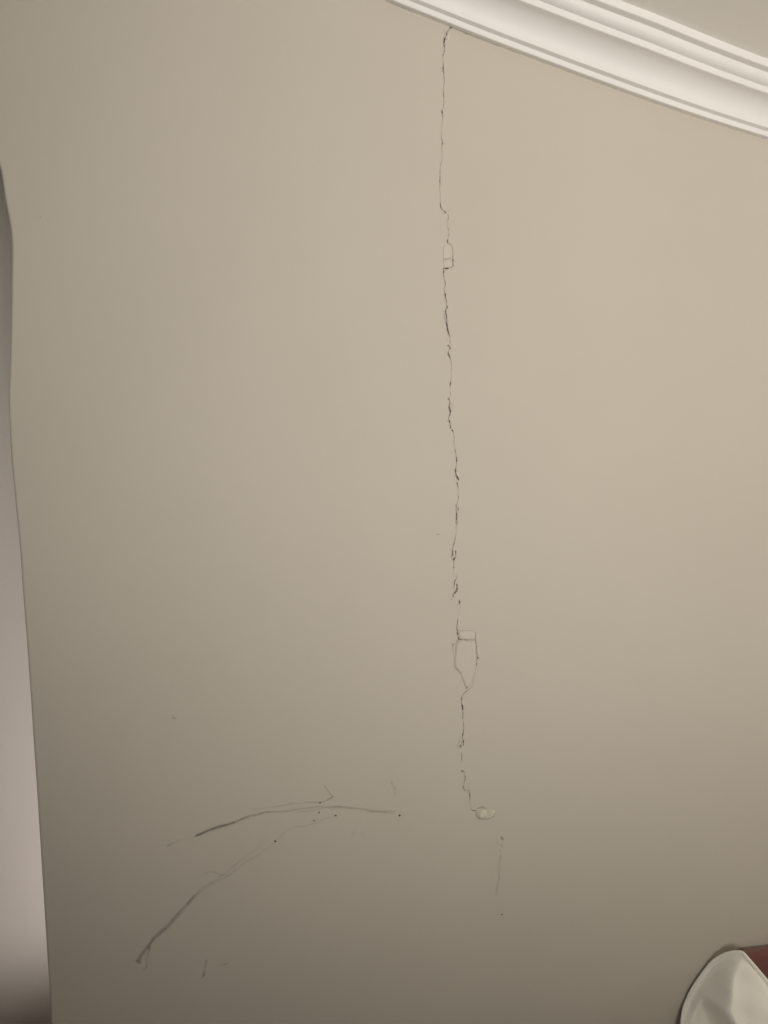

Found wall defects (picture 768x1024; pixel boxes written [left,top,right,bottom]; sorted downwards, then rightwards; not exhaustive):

crack [450,549,479,658]